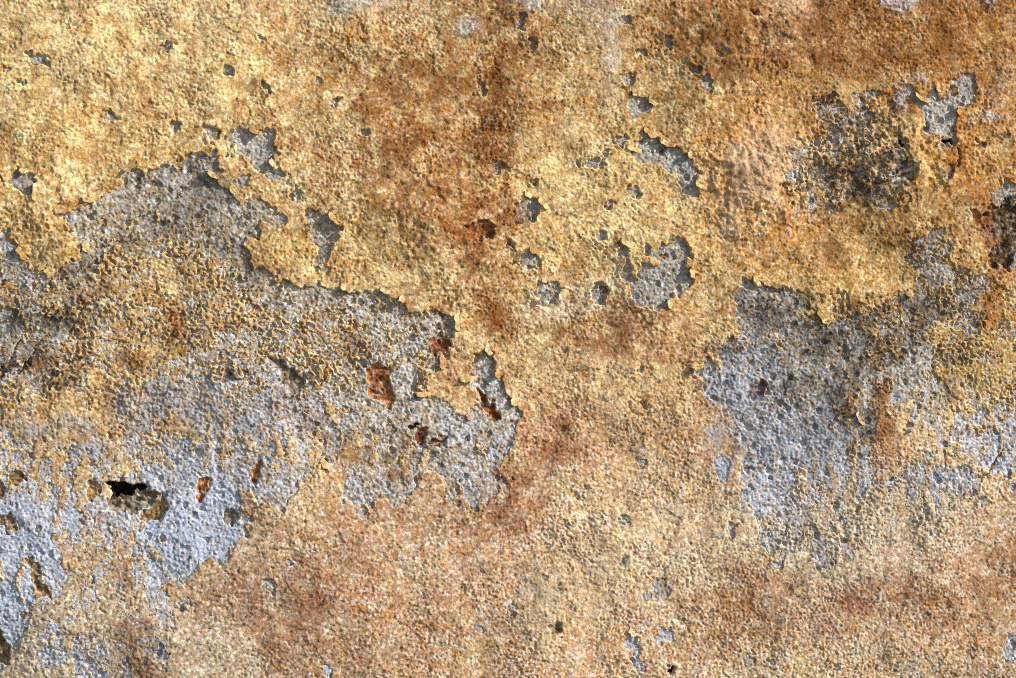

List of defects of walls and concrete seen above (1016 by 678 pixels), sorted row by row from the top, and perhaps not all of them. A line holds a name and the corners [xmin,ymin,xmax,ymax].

rust [436,171,486,239]
rust [475,63,516,132]
peeling [576,150,608,169]
peeling [615,73,703,197]
peeling [781,90,916,217]
peeling [902,73,976,181]
peeling [591,282,609,305]
peeling [617,233,696,311]
peeling [0,126,522,678]
peeling [689,180,1016,571]